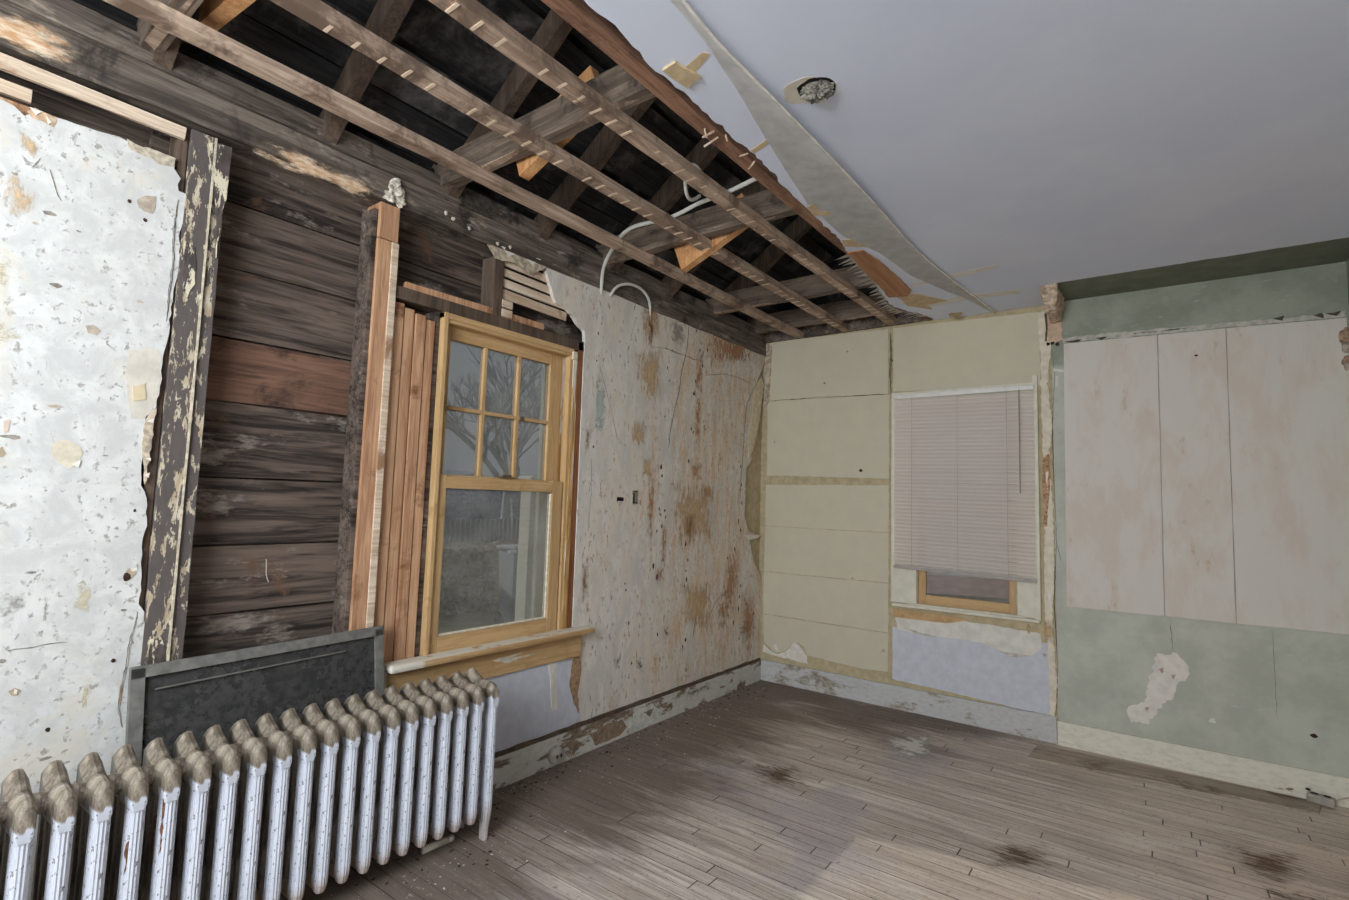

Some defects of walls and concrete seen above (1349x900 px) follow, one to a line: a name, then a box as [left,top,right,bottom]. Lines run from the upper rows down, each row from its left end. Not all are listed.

flaking render [548,656,581,713]
peeling [1127,652,1189,724]